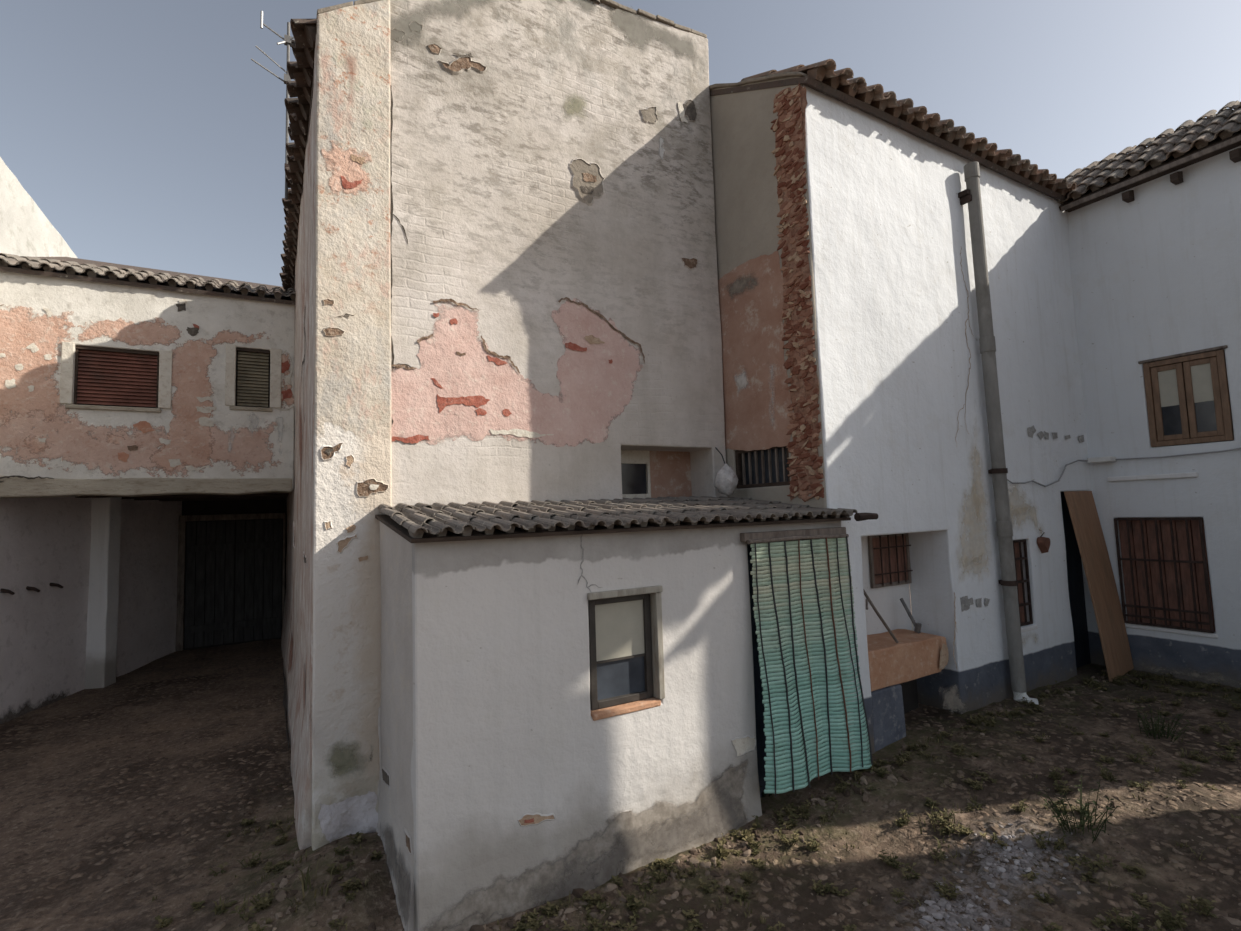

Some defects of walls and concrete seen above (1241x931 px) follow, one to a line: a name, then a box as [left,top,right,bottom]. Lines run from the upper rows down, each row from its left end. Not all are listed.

spalling [390,21,487,75]
flaking render [321,140,372,204]
spalling [568,158,605,206]
flaking render [0,299,295,477]
flaking render [391,297,645,447]
crack [955,248,973,440]
crack [578,534,601,592]
damp [329,746,371,776]
flaking render [517,813,555,826]
damp [424,760,748,931]